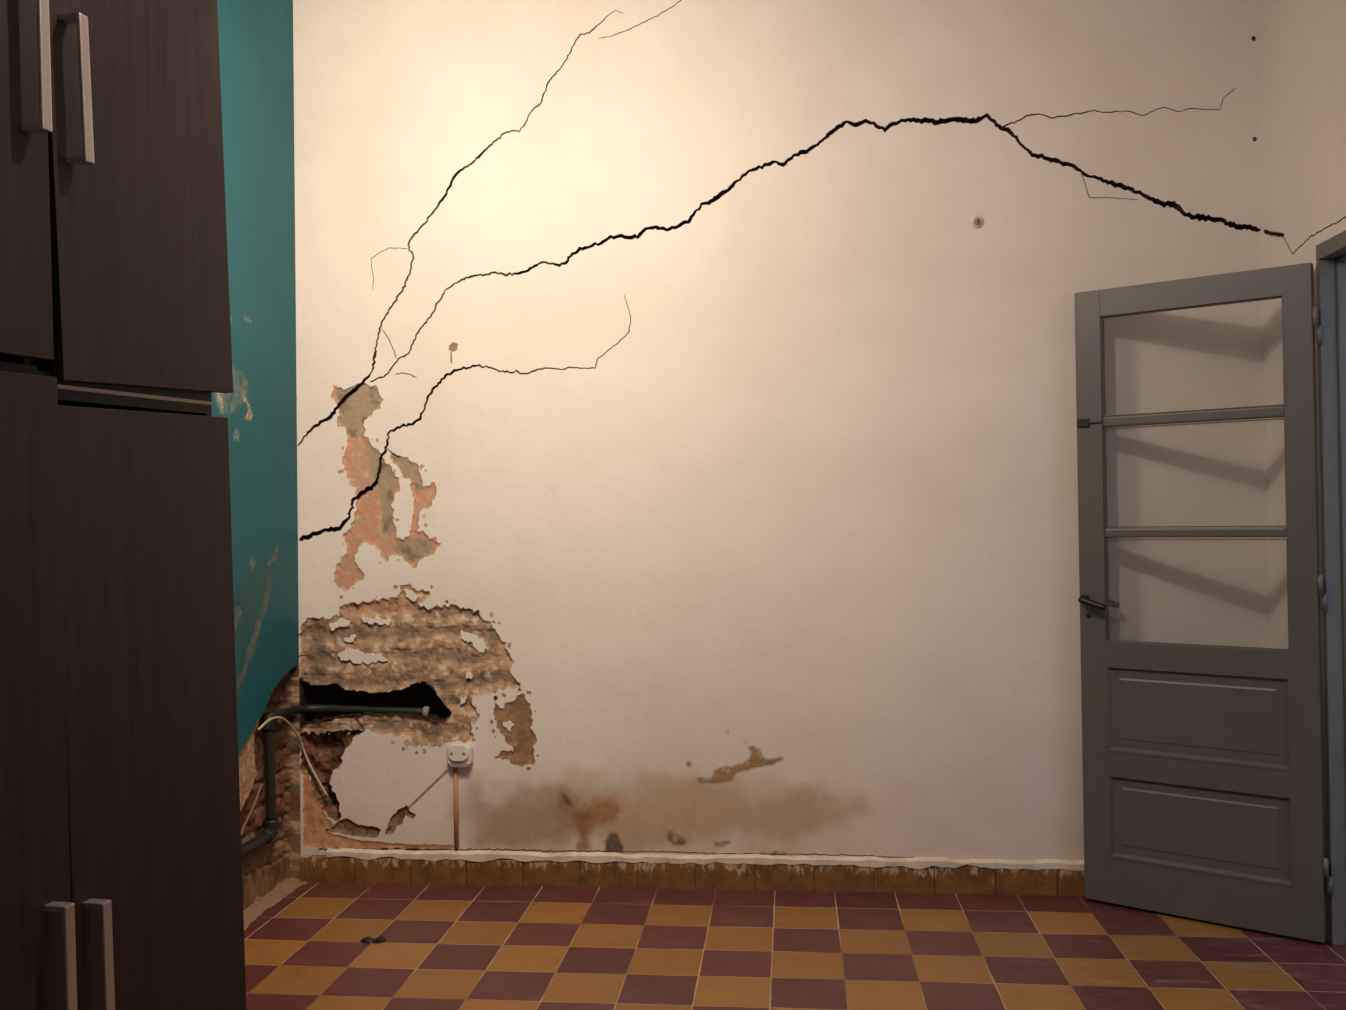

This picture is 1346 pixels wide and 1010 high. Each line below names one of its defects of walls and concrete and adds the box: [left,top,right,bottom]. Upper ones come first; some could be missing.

peeling [217,371,252,418]
spalling [239,383,539,887]
water stain [698,747,782,783]
crack [298,0,1346,541]